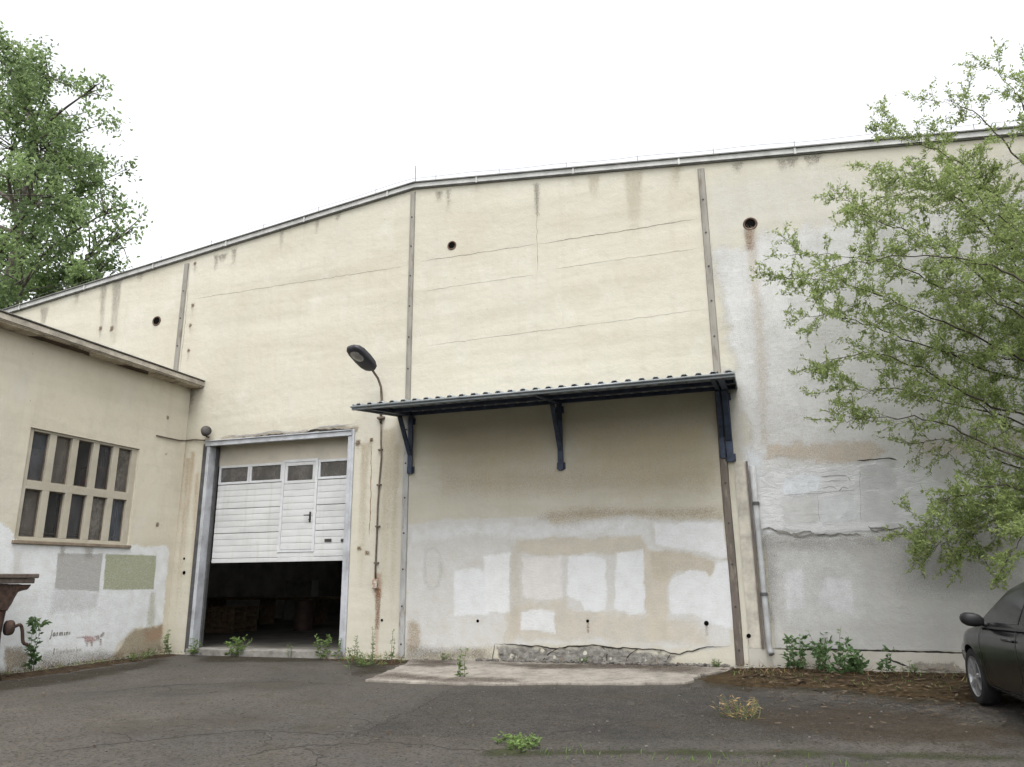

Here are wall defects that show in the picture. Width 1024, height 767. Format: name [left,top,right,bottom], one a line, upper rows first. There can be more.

crack [427,181,693,291]
damp [99,279,123,341]
rust [742,227,773,449]
rust [356,427,401,657]
crack [761,526,904,537]
crack [492,644,725,661]